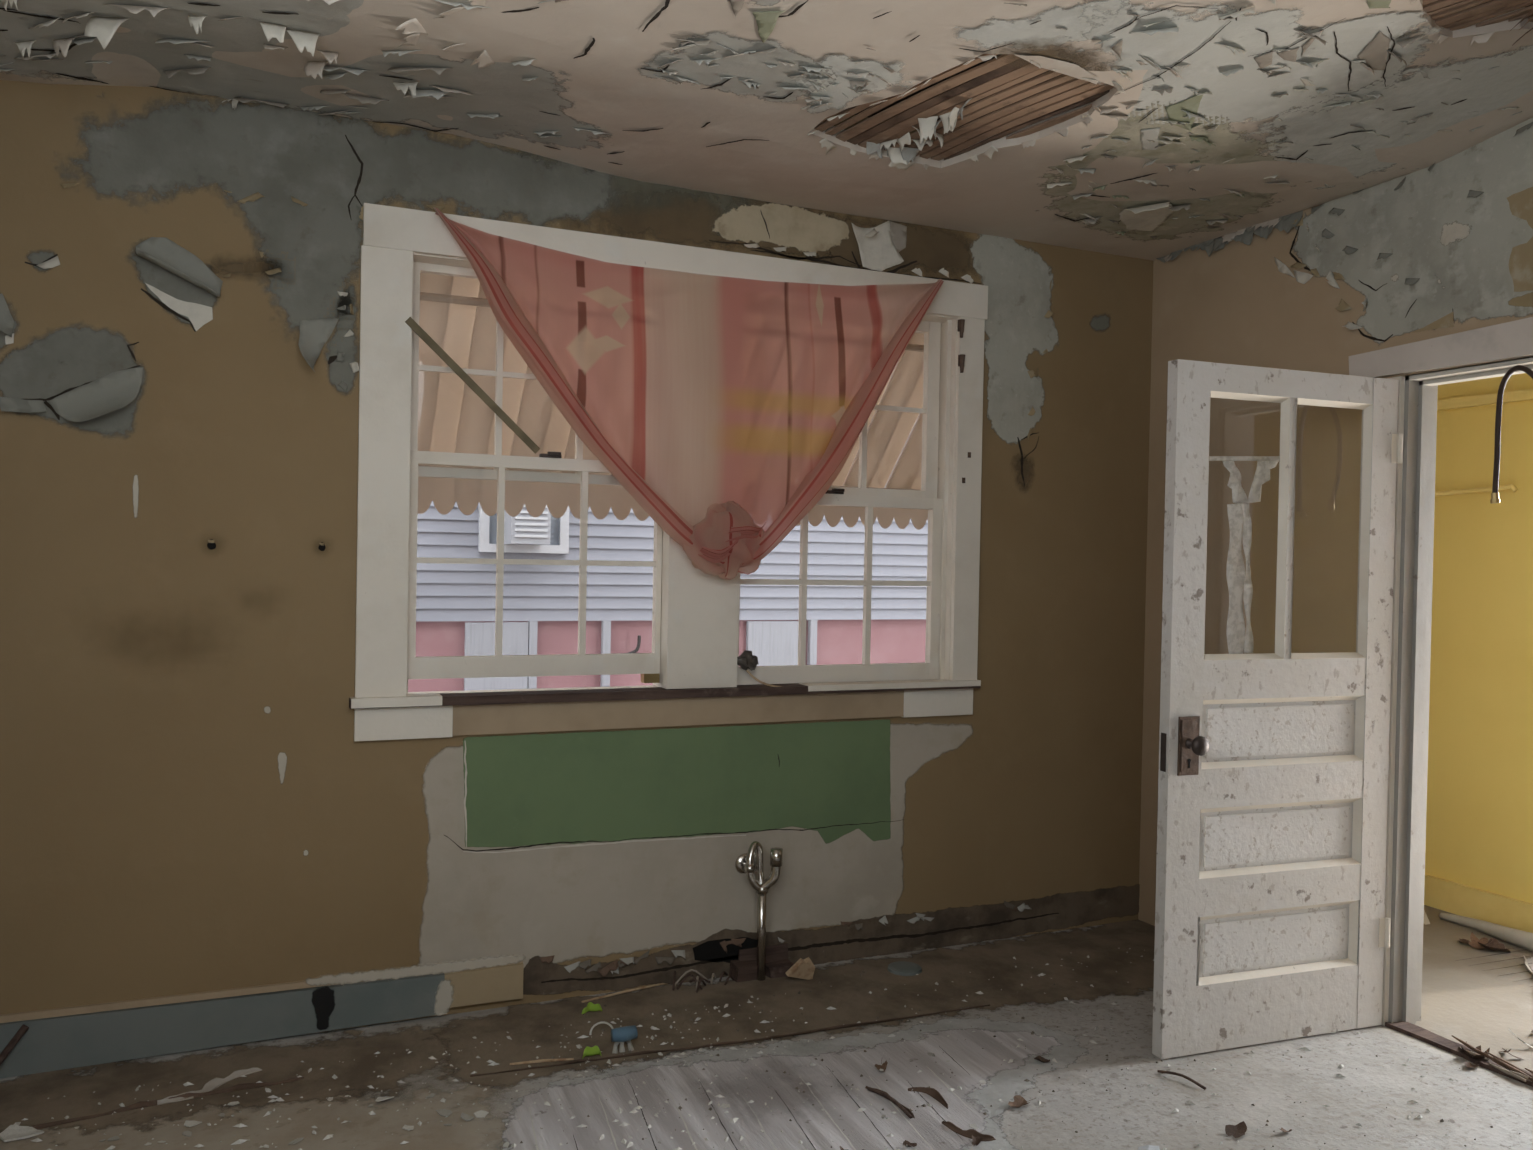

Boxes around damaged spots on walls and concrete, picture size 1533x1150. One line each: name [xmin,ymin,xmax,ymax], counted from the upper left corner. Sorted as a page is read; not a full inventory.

peeling [0,0,663,394]
crack [345,135,364,218]
peeling [638,0,1533,344]
peeling [0,325,146,437]
peeling [970,234,1058,444]
flaking render [540,955,634,974]
spalling [655,937,757,965]
flaking render [907,913,934,924]